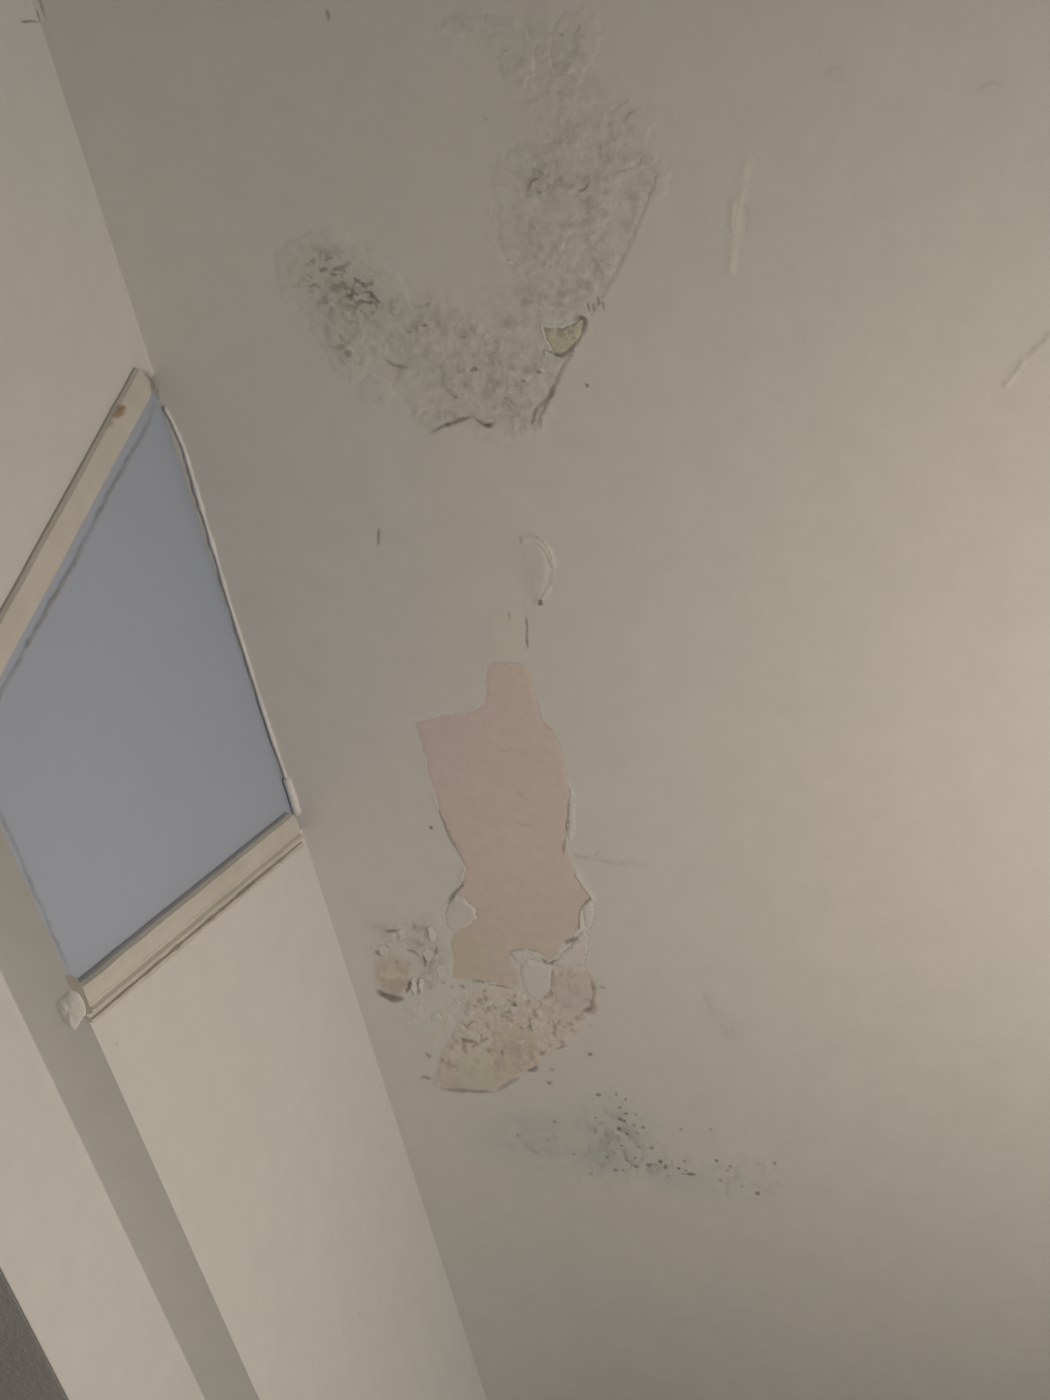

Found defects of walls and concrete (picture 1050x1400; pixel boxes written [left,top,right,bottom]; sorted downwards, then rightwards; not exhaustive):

peeling [357,903,601,1092]
water stain [426,1064,821,1227]